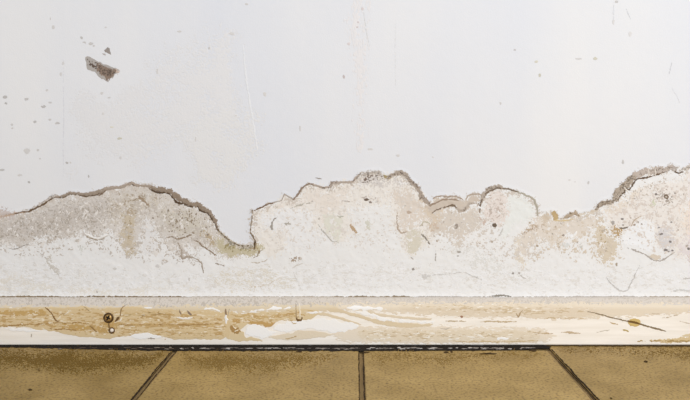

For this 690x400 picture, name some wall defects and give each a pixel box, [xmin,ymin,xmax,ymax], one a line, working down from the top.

spalling [85,47,119,82]
spalling [2,193,217,262]
crack [0,178,690,297]
leakage [0,162,690,316]
flaking render [434,175,690,268]
leakage [0,309,311,340]